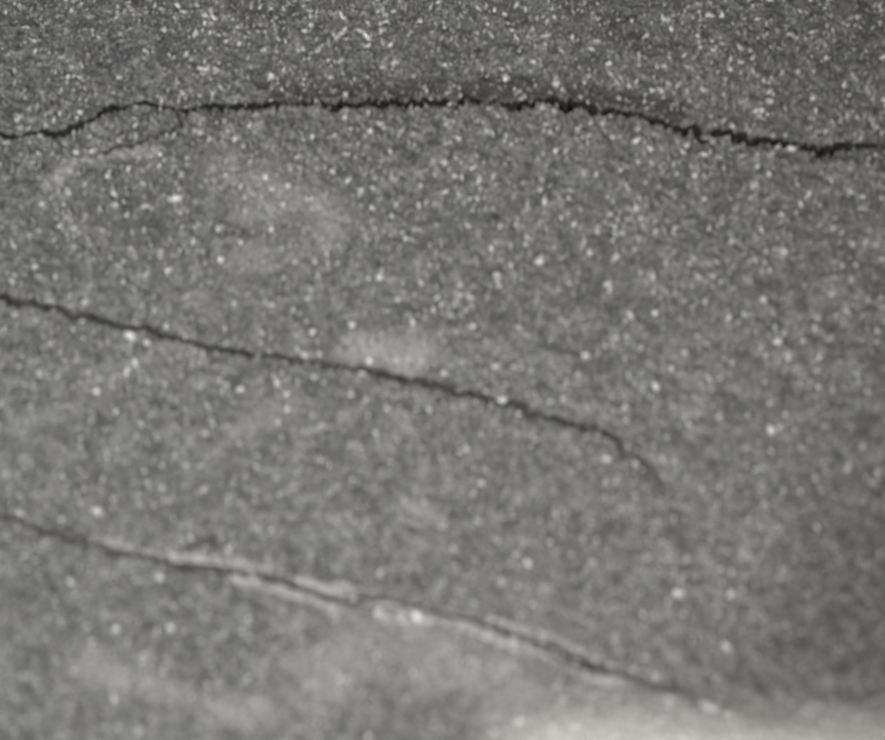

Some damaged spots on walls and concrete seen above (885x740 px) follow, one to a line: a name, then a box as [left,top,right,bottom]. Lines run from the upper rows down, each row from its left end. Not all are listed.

crack [0,94,885,158]
crack [0,291,664,493]
crack [0,515,885,740]